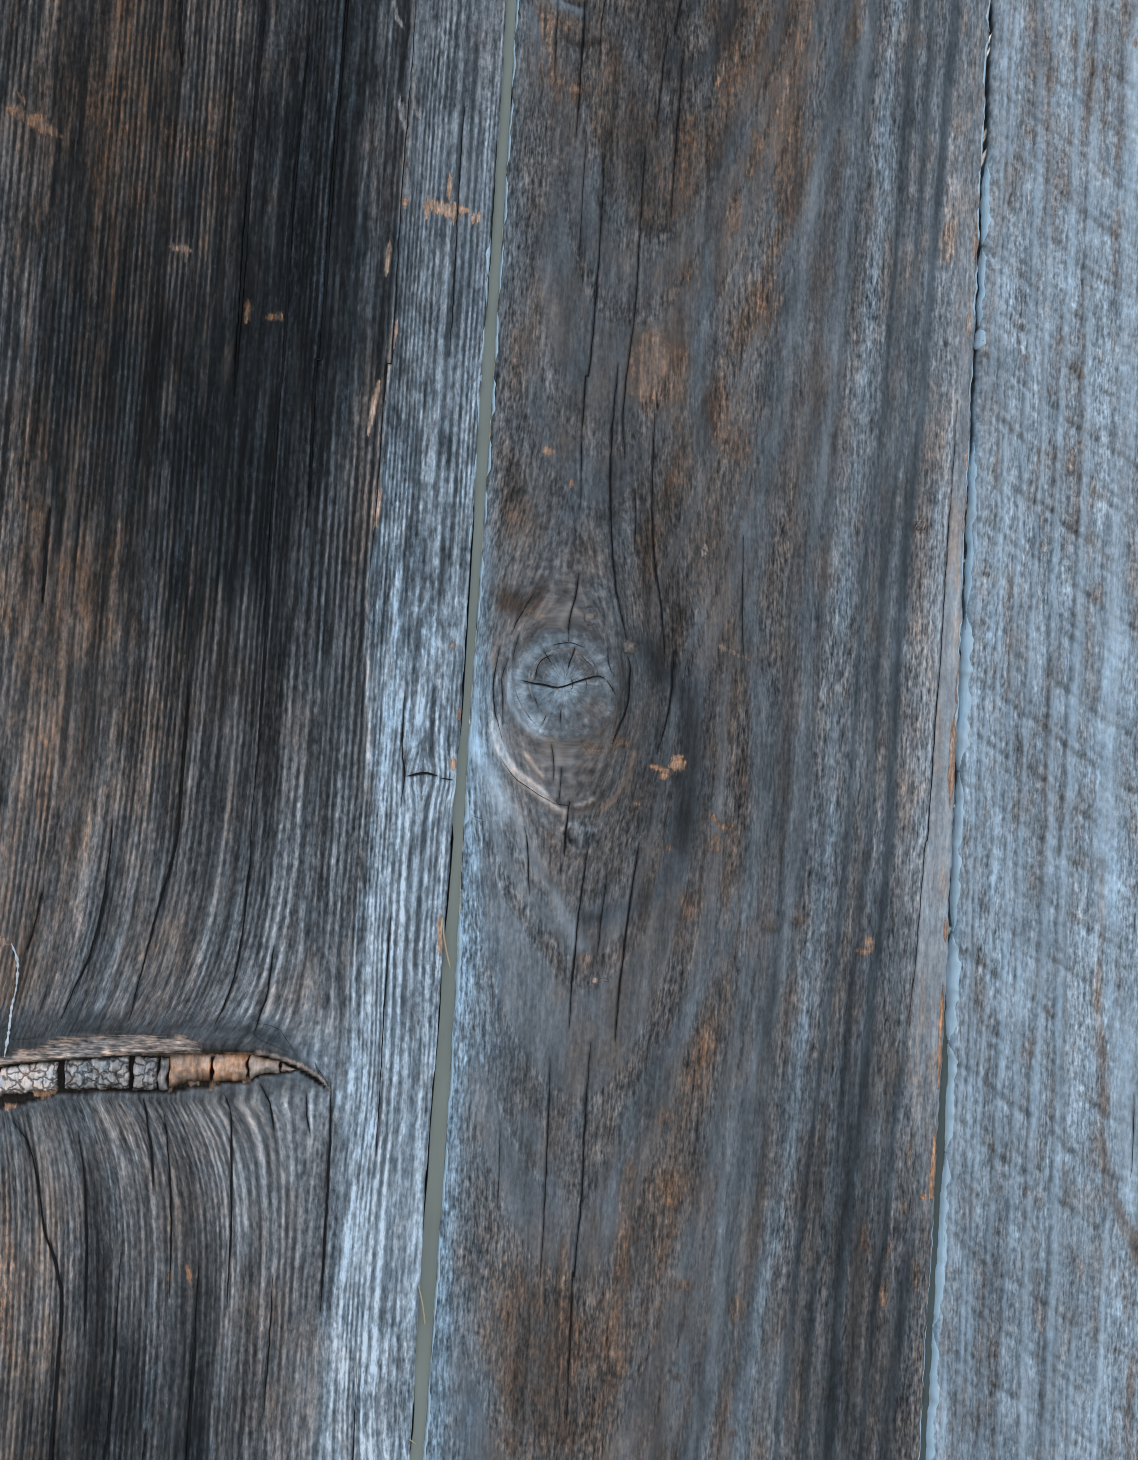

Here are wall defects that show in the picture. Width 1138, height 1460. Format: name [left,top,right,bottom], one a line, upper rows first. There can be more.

crack [27,894,42,949]
crack [13,1121,121,1460]
crack [143,1098,233,1460]
crack [264,1278,273,1403]